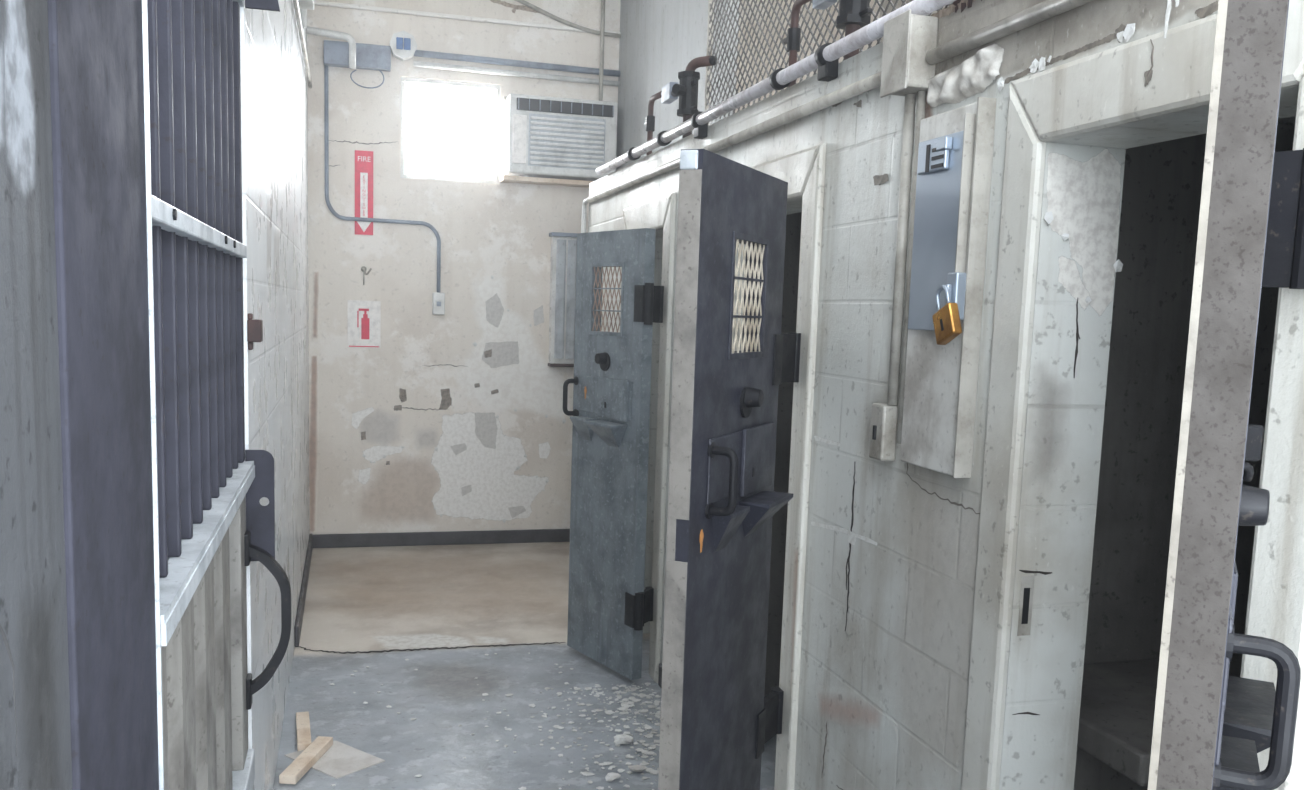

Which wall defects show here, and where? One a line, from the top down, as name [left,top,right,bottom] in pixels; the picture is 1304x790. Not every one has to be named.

crack [1073,298,1081,378]
peeling [431,270,573,523]
peeling [351,407,404,484]
crack [906,463,980,514]
crack [845,462,855,631]